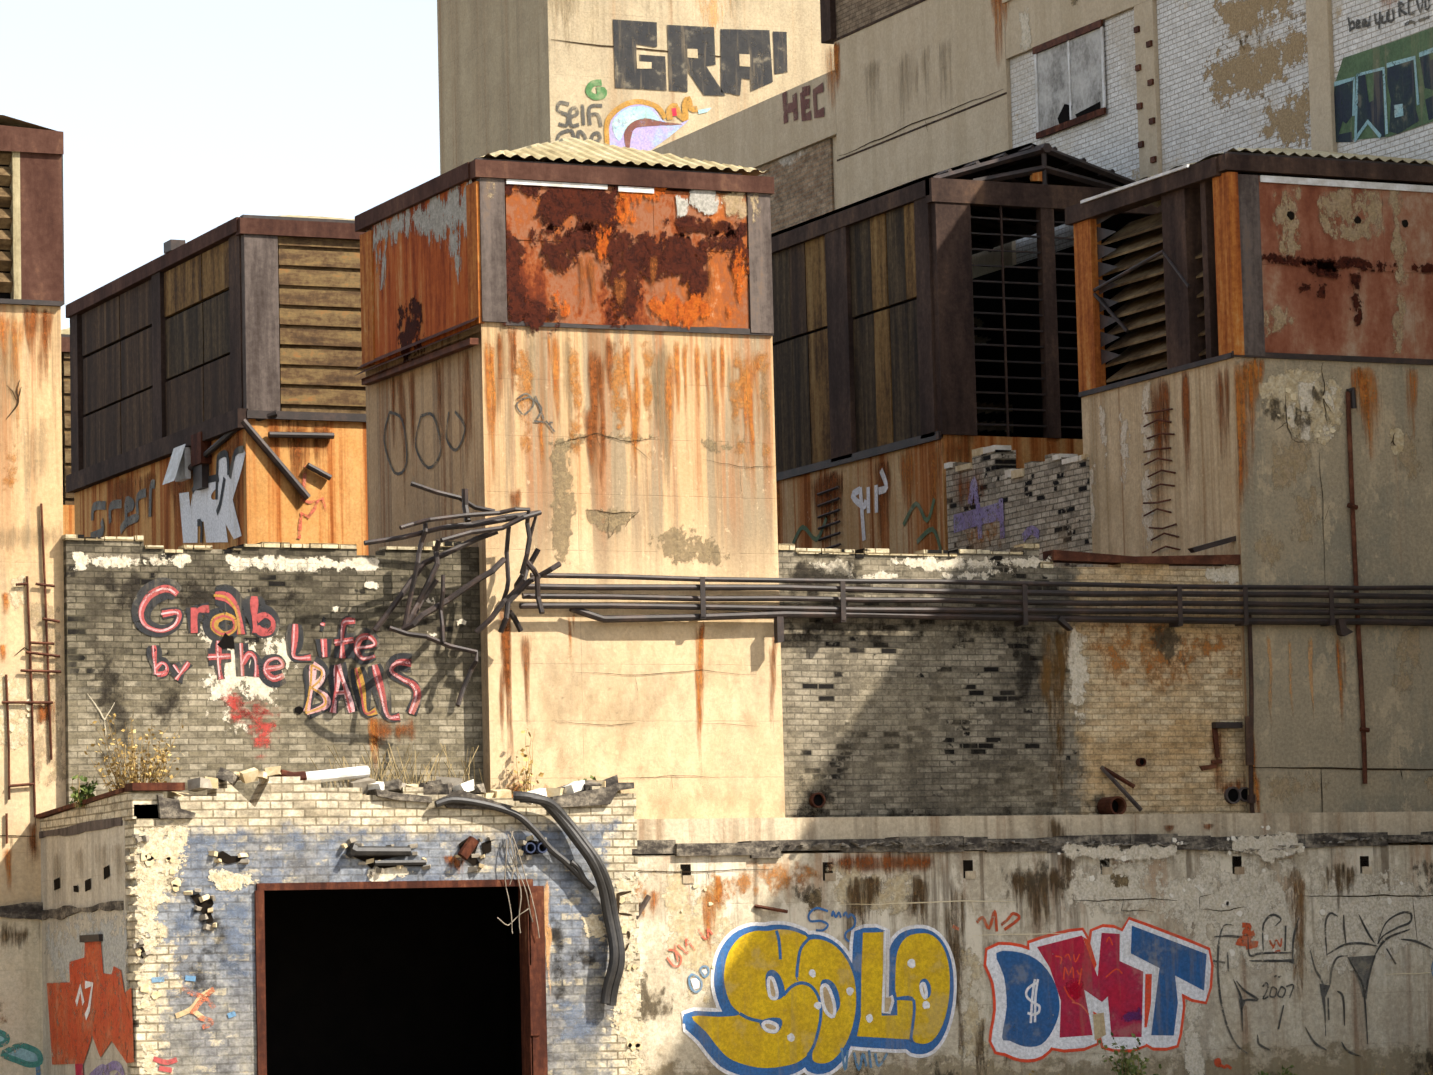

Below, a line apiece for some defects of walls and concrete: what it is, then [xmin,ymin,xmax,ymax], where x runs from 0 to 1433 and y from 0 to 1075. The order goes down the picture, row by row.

peeling [1202,0,1311,149]
rust [0,309,52,371]
rust [462,179,770,465]
rust [1217,176,1433,496]
peeling [1256,368,1343,446]
spalling [549,433,656,562]
rust [696,624,705,727]
spalling [45,819,258,1075]
leakage [639,972,673,1020]
leakage [847,877,880,922]
leakage [946,888,984,1074]
leakage [1007,857,1071,923]